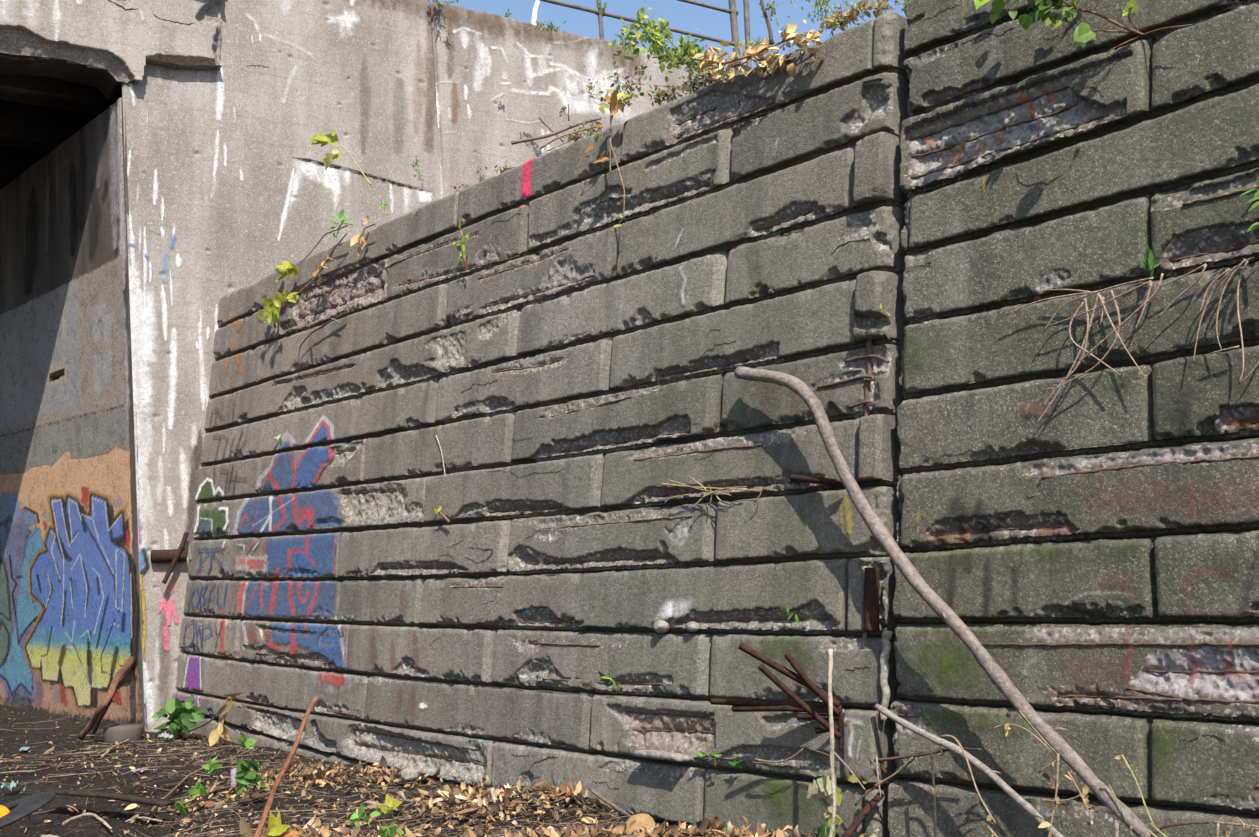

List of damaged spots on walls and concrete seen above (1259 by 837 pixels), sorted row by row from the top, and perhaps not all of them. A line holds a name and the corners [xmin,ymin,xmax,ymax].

spalling [914,42,959,65]
spalling [832,55,1133,280]
spalling [1157,223,1259,277]
spalling [272,171,716,415]
spalling [532,417,810,463]
spalling [1019,406,1259,479]
rust [162,532,189,584]
spalling [370,471,831,590]
spalling [925,512,1083,551]
spalling [494,607,836,781]
rust [709,642,850,750]